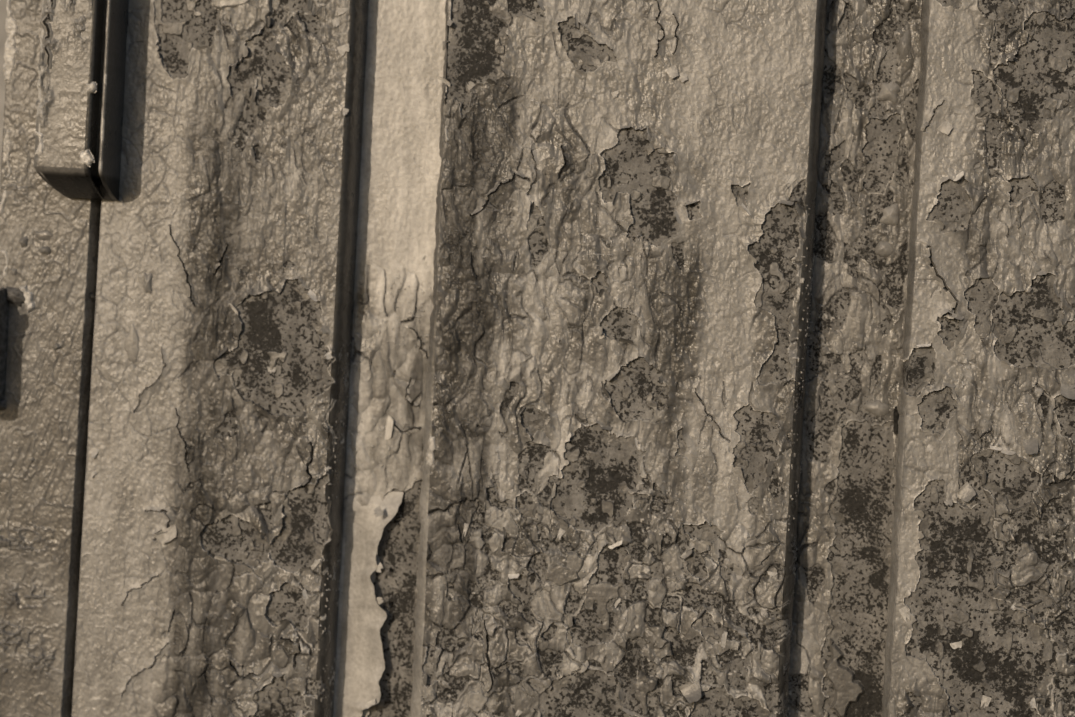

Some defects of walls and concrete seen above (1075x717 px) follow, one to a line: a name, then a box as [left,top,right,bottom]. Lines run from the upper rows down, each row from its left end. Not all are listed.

peeling [437,0,546,118]
crack [139,348,168,403]
peeling [213,279,334,416]
crack [301,443,313,486]
crack [122,644,171,699]
crack [227,662,258,681]
crack [280,638,301,667]
peeling [337,480,448,717]
crack [480,620,493,692]
peeling [516,357,669,717]
peeling [821,421,895,717]
peeling [904,446,1068,717]